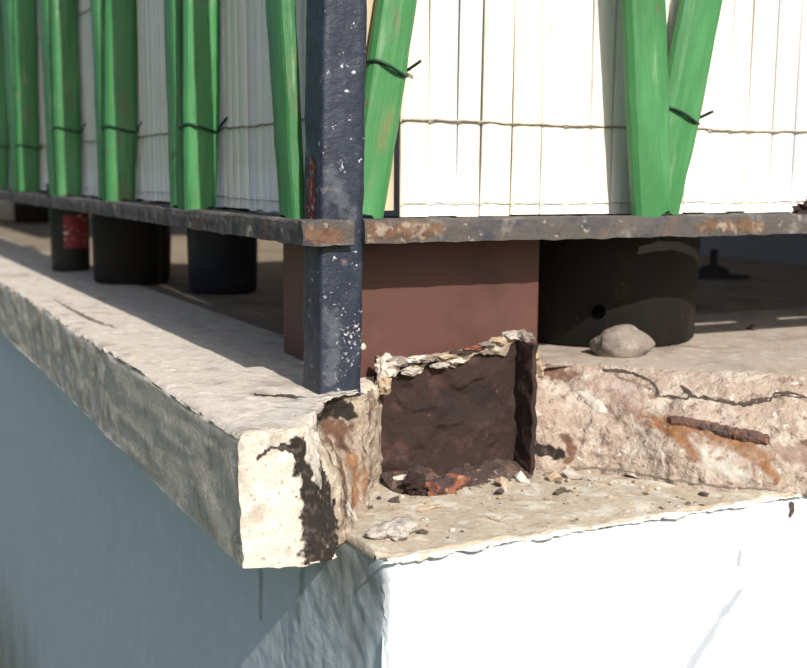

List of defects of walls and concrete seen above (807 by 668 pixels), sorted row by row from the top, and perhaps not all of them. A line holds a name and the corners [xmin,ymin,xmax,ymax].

corrosion [366,219,445,243]
peeling [374,330,536,395]
peeling [536,350,546,378]
crack [602,368,807,407]
water stain [278,406,356,565]
corrosion [344,445,368,510]
corrosion [639,414,779,484]